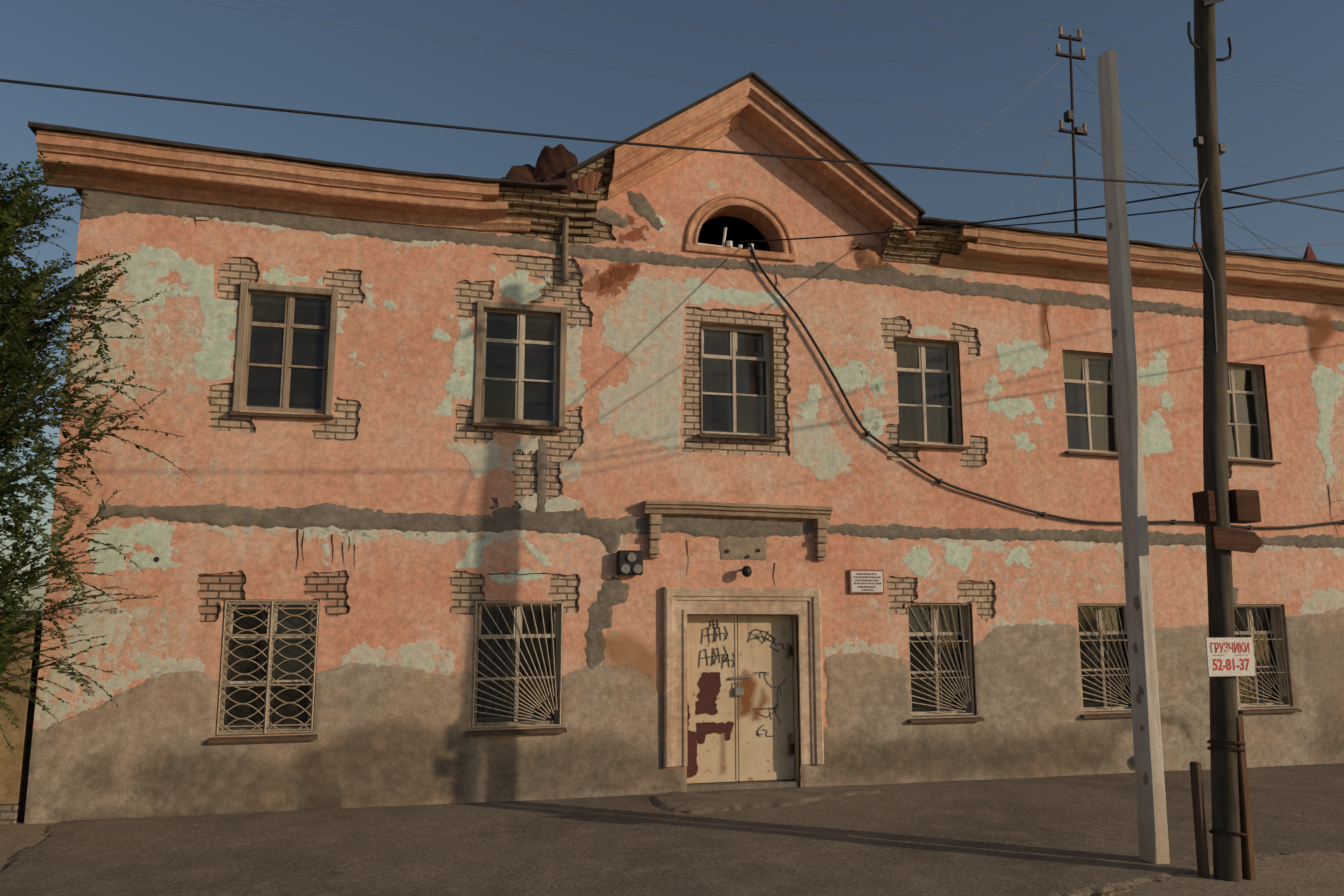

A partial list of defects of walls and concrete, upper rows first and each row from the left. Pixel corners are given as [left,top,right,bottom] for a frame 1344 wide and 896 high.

peeling [909,263,971,278]
peeling [66,242,397,434]
flaking render [311,397,361,442]
peeling [432,212,853,512]
peeling [832,359,920,462]
peeling [881,316,1059,452]
flaking render [959,436,987,469]
peeling [1310,360,1344,481]
peeling [34,520,595,729]
peeling [823,637,900,658]
peeling [887,538,1067,632]
peeling [1053,540,1128,569]